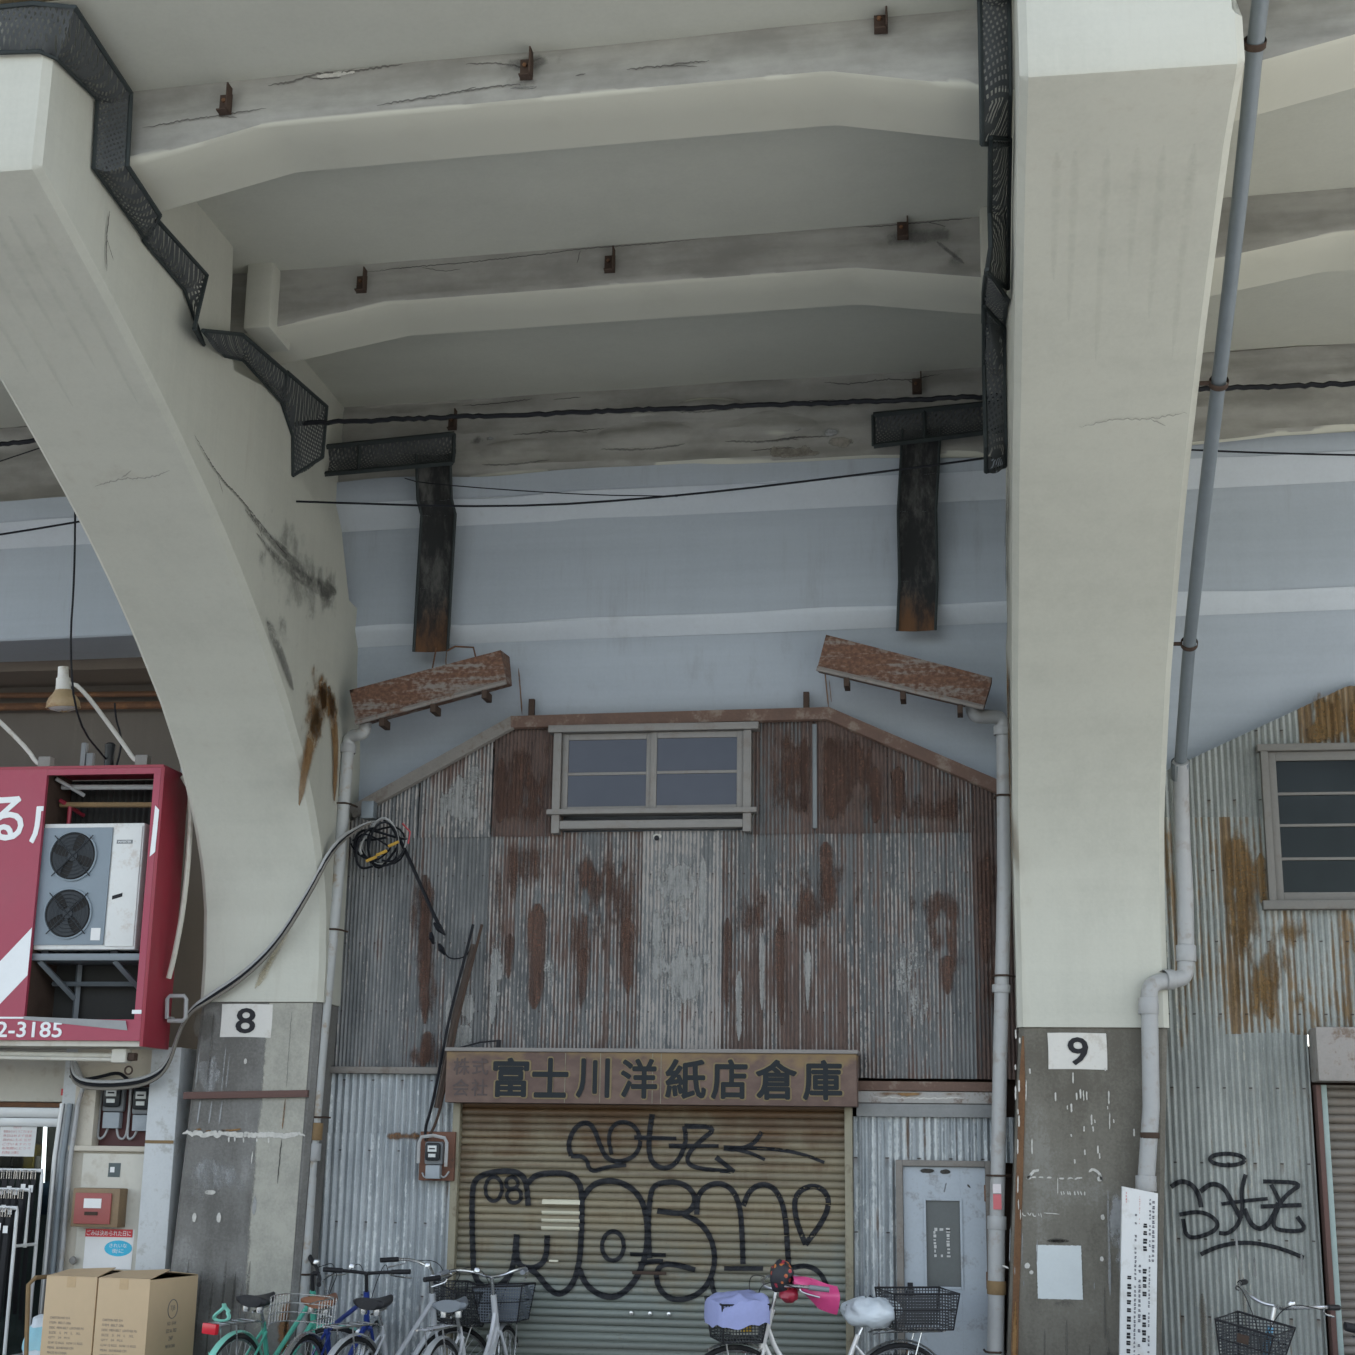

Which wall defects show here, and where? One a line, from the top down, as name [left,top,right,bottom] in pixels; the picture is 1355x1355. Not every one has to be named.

crack [143,64,402,128]
crack [377,58,540,106]
leakage [246,510,336,605]
leakage [267,622,294,690]
rust [298,668,339,806]
rust [1309,692,1355,743]
rust [496,844,550,1009]
rust [570,857,635,1008]
rust [723,842,843,1025]
rust [910,892,958,995]
rust [1225,832,1305,1020]